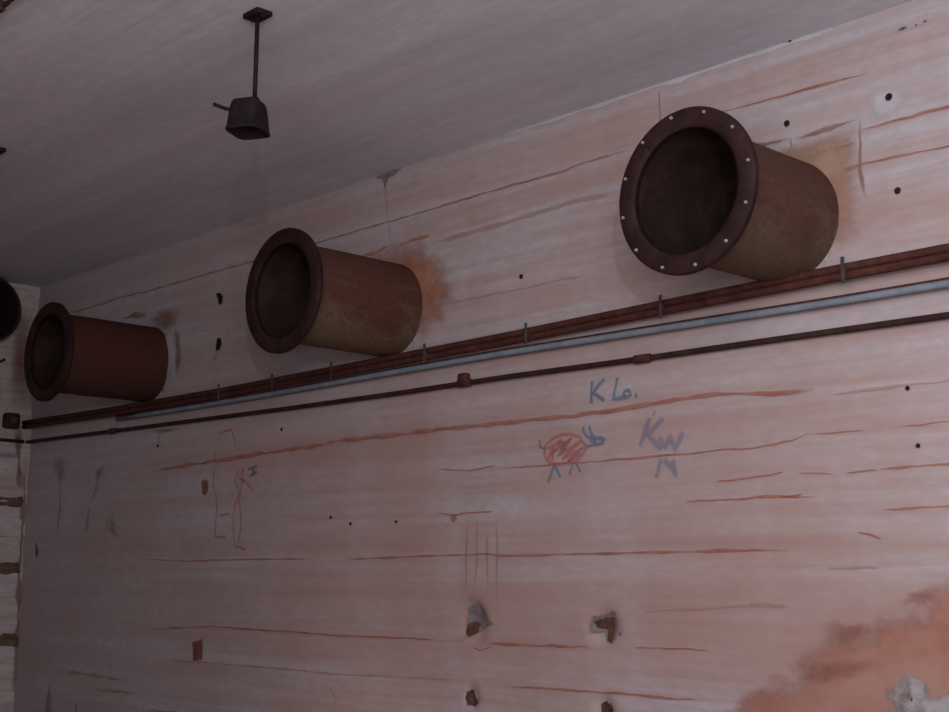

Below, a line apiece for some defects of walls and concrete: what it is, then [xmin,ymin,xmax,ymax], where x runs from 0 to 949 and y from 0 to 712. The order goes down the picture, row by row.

rust [757,122,863,225]
rust [361,235,446,330]
spalling [466,601,492,637]
spalling [589,611,622,643]
spalling [601,701,613,712]